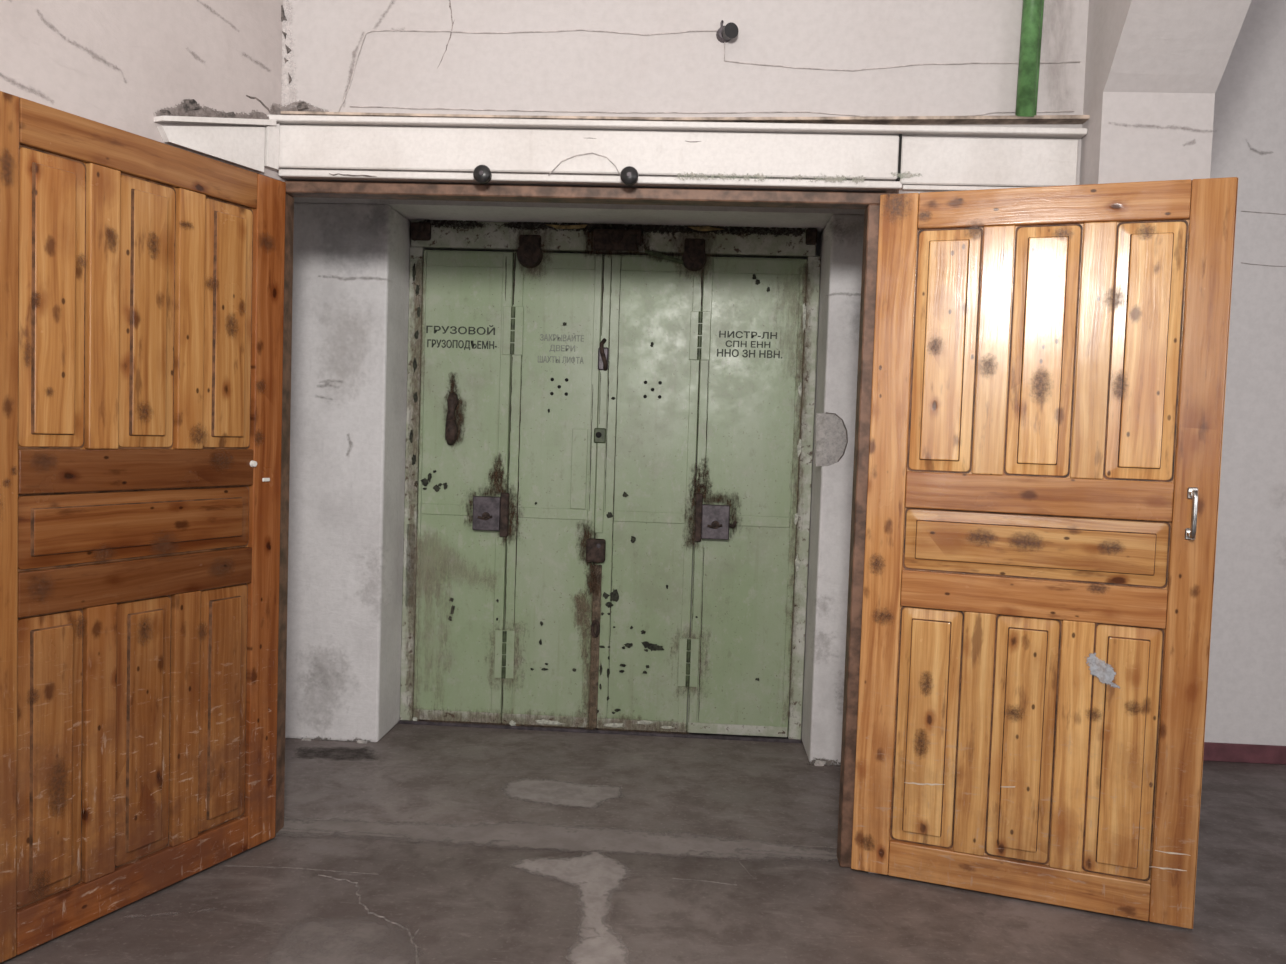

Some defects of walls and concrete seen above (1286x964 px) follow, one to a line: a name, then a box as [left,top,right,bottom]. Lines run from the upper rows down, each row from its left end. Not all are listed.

crack [437,0,454,68]
crack [246,95,270,113]
rust [445,373,466,445]
rust [584,227,674,555]
rust [467,357,522,623]
rust [685,462,739,719]
crack [318,875,420,964]